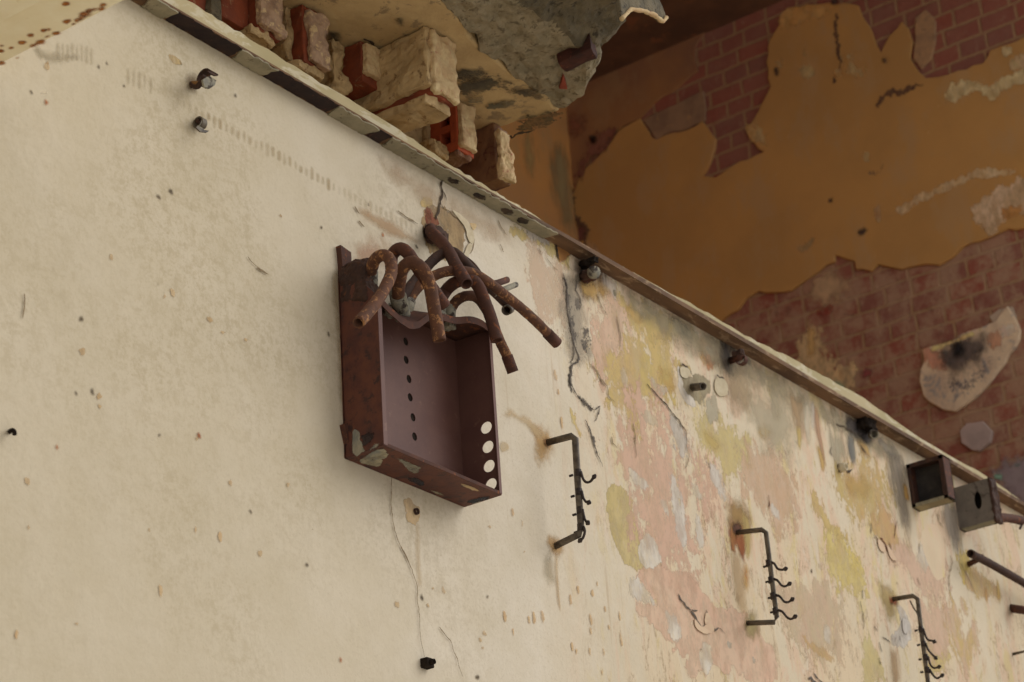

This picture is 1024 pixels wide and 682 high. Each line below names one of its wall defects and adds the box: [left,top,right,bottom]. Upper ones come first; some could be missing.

spalling [441,0,626,181]
crack [832,13,843,84]
crack [876,83,923,108]
peeling [944,46,1024,103]
crack [539,190,637,467]
corrosion [509,413,551,458]
crack [647,383,689,467]
peeling [585,284,1000,682]
crack [391,478,463,676]